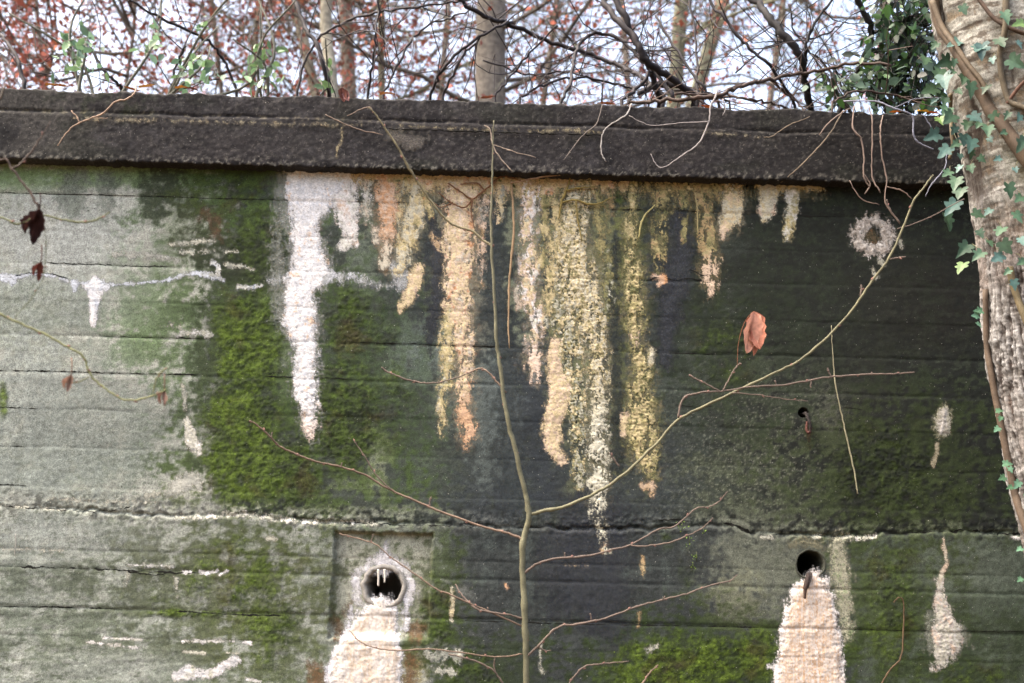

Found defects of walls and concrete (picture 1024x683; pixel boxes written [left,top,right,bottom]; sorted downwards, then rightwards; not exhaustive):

leakage [849,211,904,280]
leakage [267,171,824,647]
leakage [931,402,953,468]
leakage [324,541,419,683]
leakage [424,647,465,676]
leakage [766,530,877,683]
leakage [920,537,973,672]